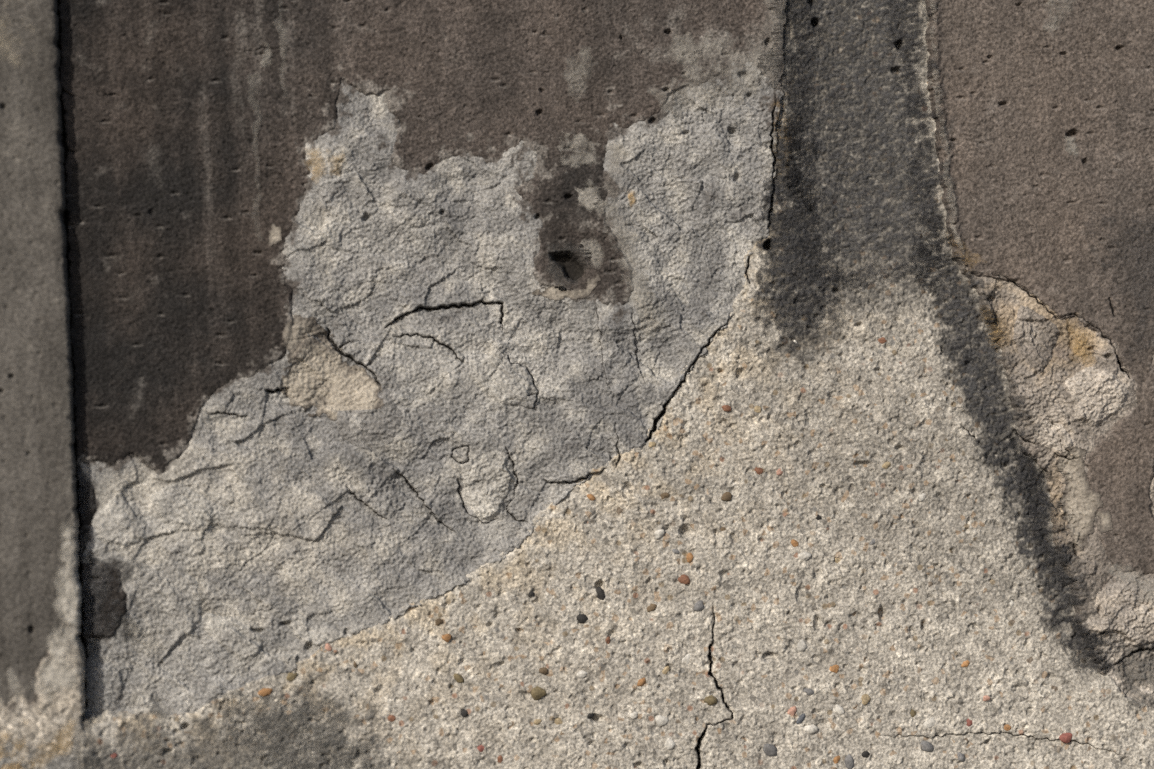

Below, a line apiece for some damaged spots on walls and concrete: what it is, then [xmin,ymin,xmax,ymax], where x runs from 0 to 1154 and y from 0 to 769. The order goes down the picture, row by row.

crack [327,328,381,391]
spalling [0,61,784,769]
crack [395,446,527,532]
crack [385,300,539,408]
crack [546,314,735,483]
water stain [757,0,1110,670]
spalling [954,258,1154,708]
crack [695,608,733,769]